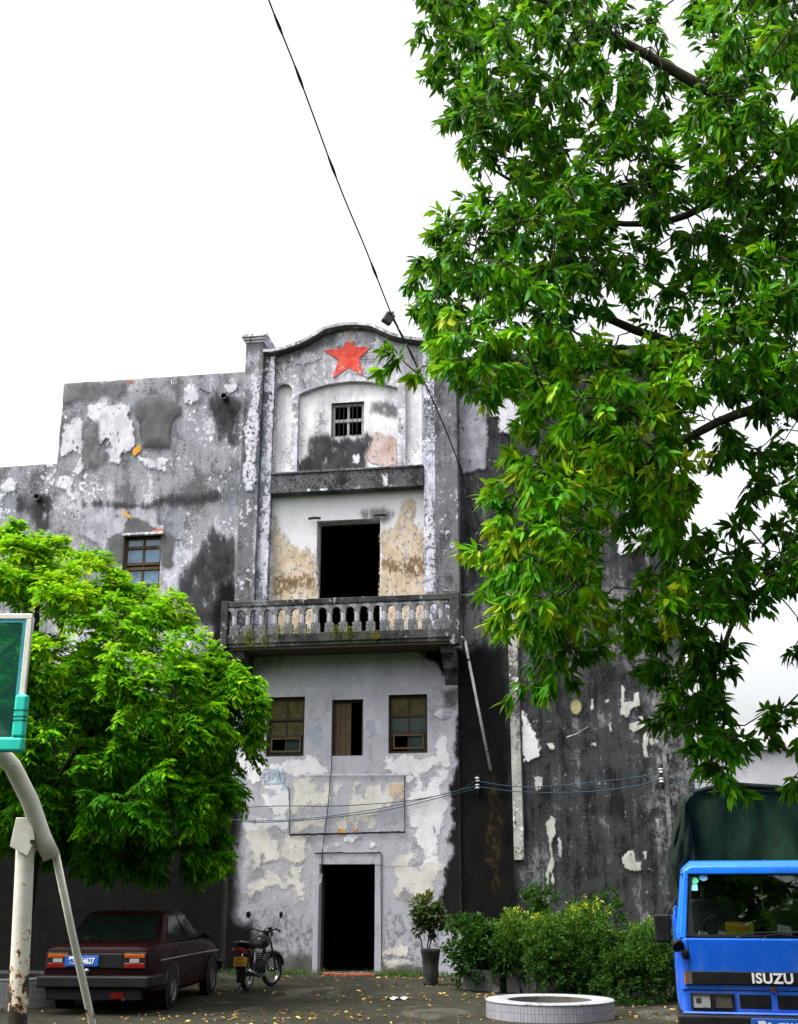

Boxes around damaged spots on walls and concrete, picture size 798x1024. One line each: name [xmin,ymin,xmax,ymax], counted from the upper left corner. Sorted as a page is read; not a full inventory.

peeling [55,401,168,551]
water stain [209,394,242,445]
peeling [243,357,275,492]
water stain [298,432,372,484]
water stain [178,526,235,665]
peeling [258,496,319,632]
peeling [378,494,436,629]
peeling [238,708,451,904]
peeling [521,711,555,762]
water stain [644,693,694,872]
water stain [0,852,15,971]
water stain [30,782,312,974]